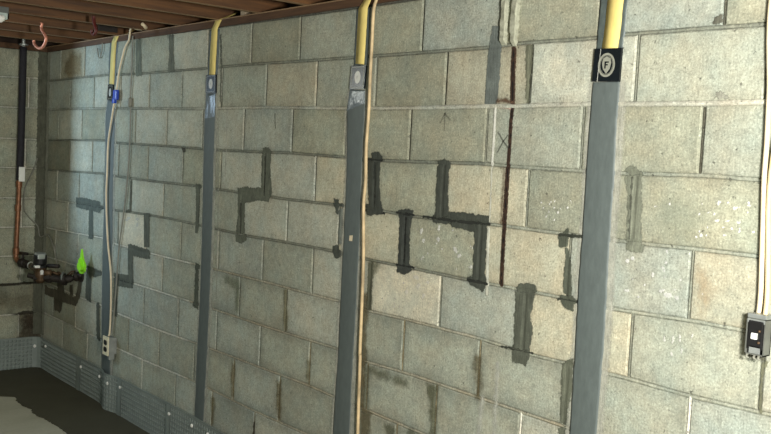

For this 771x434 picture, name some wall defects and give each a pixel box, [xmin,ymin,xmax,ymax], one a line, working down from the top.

crack [365,46,534,287]